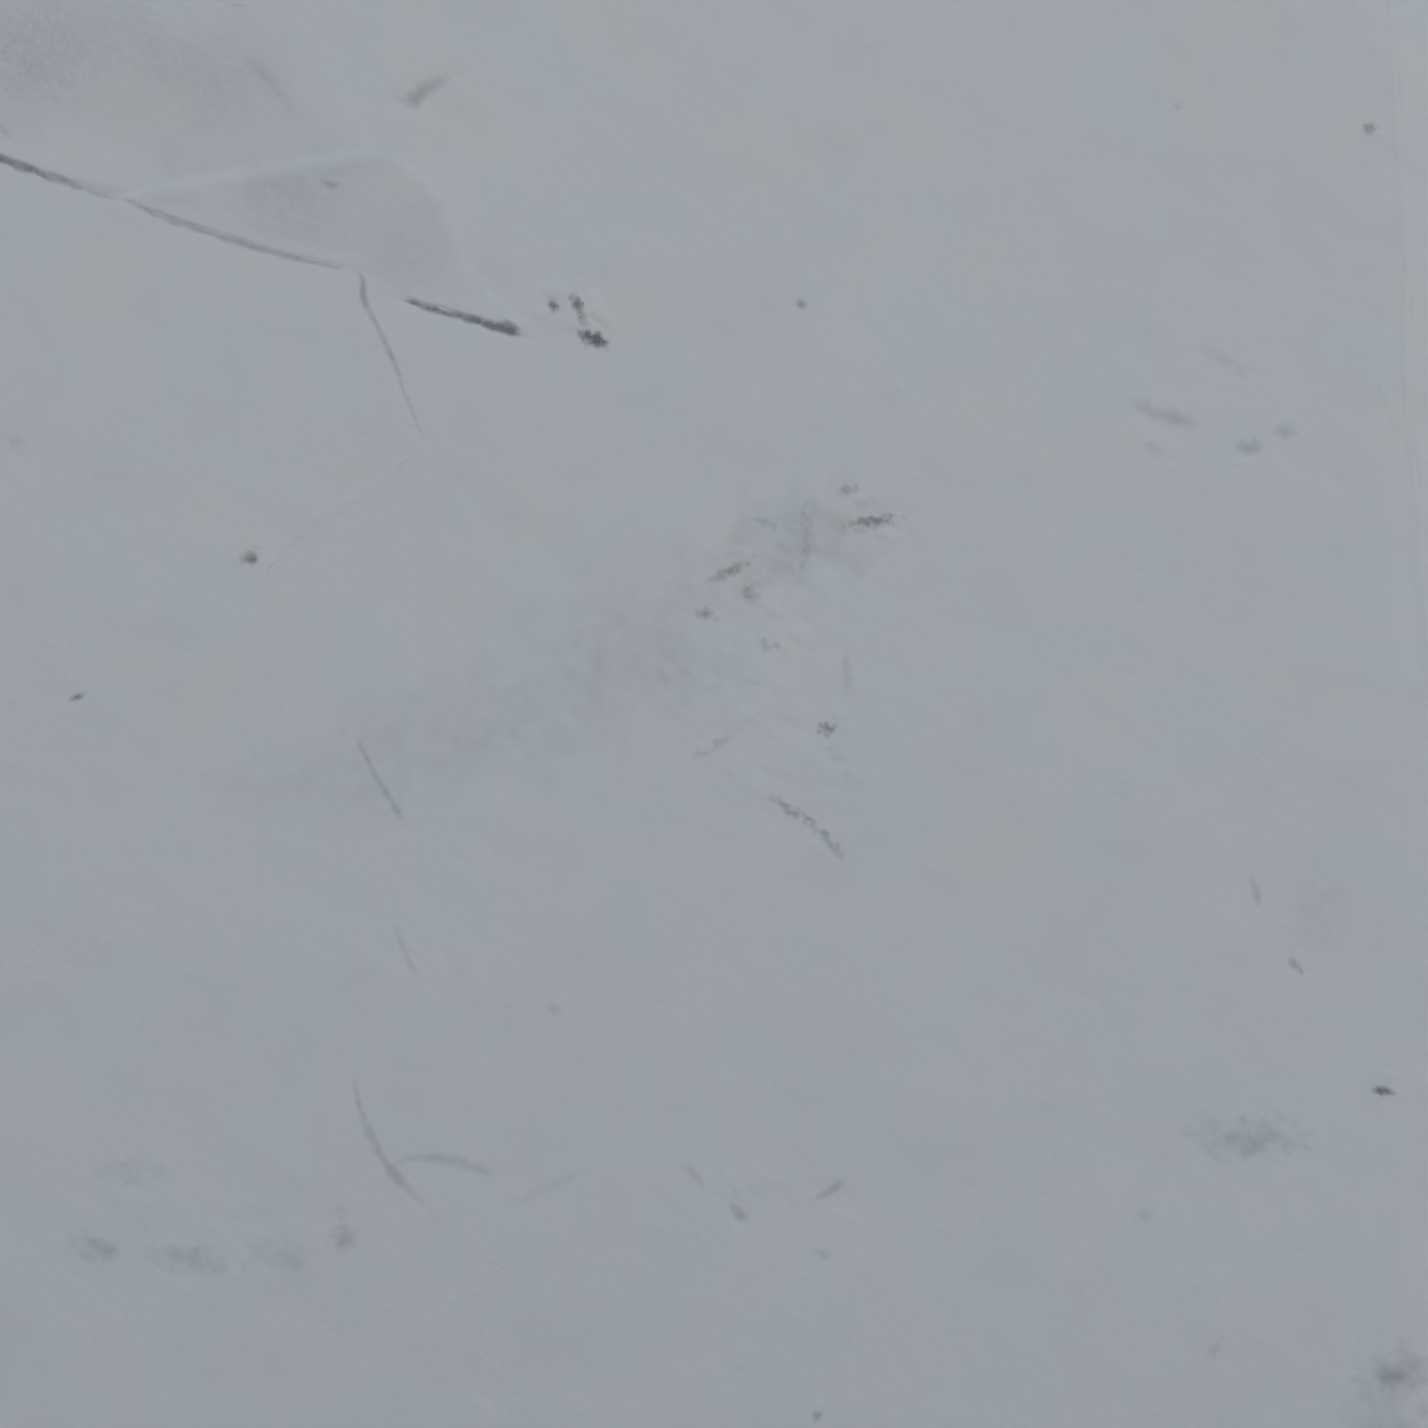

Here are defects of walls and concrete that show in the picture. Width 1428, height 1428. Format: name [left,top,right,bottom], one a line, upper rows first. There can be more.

crack [414,302,515,334]